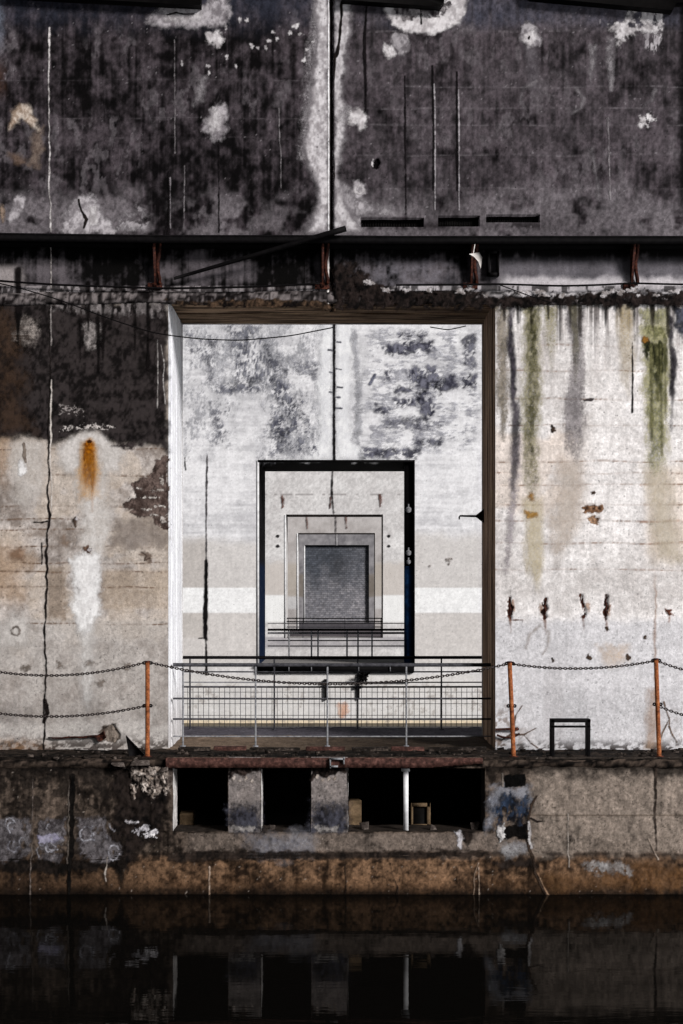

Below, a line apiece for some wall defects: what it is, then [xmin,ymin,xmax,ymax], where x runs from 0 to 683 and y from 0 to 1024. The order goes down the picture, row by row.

damp [147,0,232,48]
damp [383,0,466,59]
damp [301,0,388,235]
damp [62,195,148,234]
crack [34,27,52,749]
damp [620,305,683,455]
damp [0,267,170,701]
corrosion [81,440,97,495]
peeling [111,455,170,563]
damp [495,305,586,580]
spalling [125,766,173,800]
spalling [497,821,532,849]